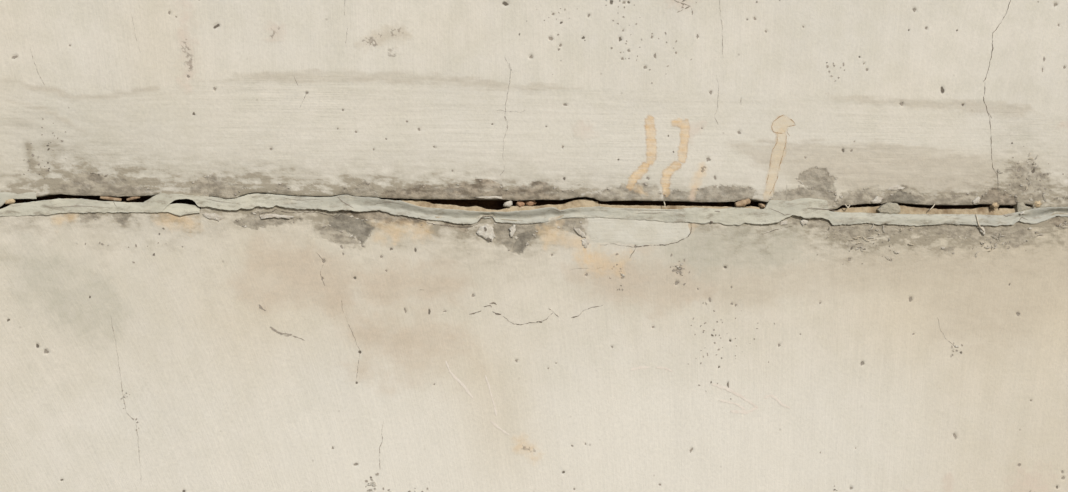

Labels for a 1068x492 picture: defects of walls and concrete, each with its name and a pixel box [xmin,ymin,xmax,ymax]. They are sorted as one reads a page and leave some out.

crack [0,195,201,209]
spalling [79,212,132,227]
spalling [185,171,249,199]
spalling [202,170,758,256]
crack [380,198,765,257]
corrosion [625,114,710,202]
corrosion [761,114,795,202]
leakage [722,136,1001,196]
crack [831,202,1017,211]
spalling [785,153,1068,264]
crack [471,302,598,325]